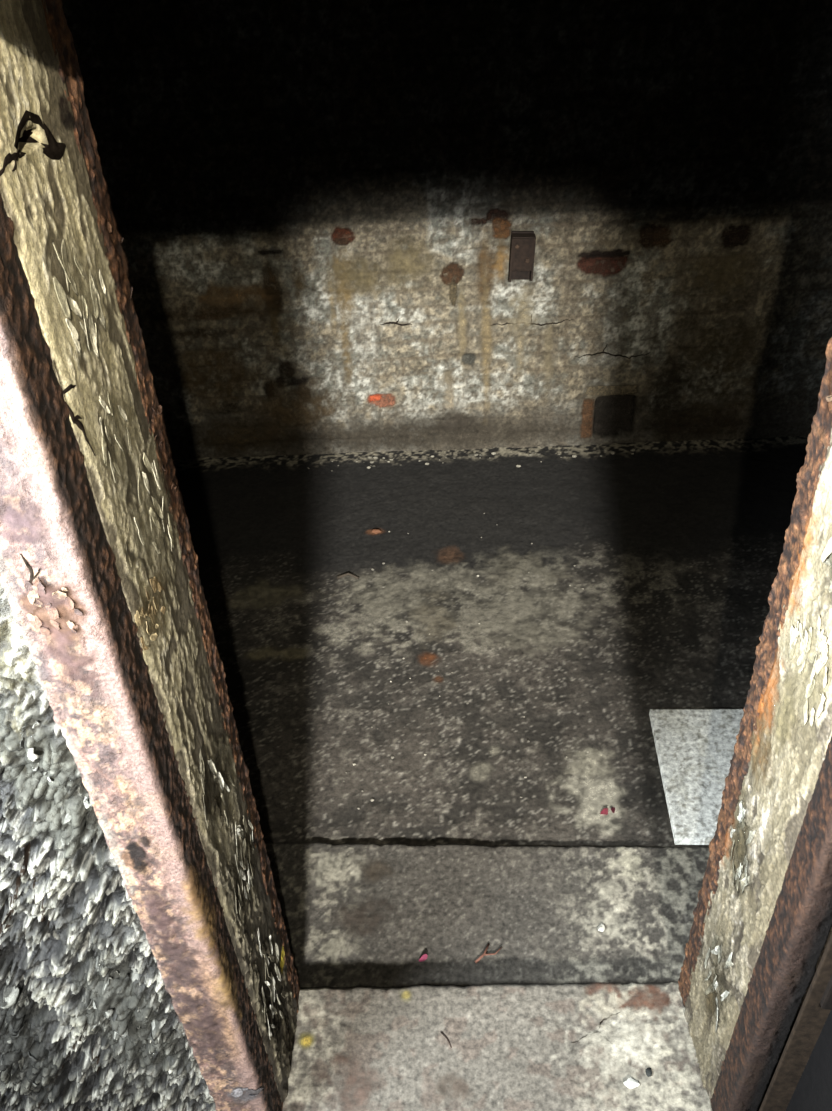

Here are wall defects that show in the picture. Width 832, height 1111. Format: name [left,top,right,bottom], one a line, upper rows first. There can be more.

rust [789,534,811,607]
rust [21,578,91,683]
rust [757,663,779,724]
rust [184,868,214,934]
rust [144,888,242,1064]
rust [230,1087,264,1102]